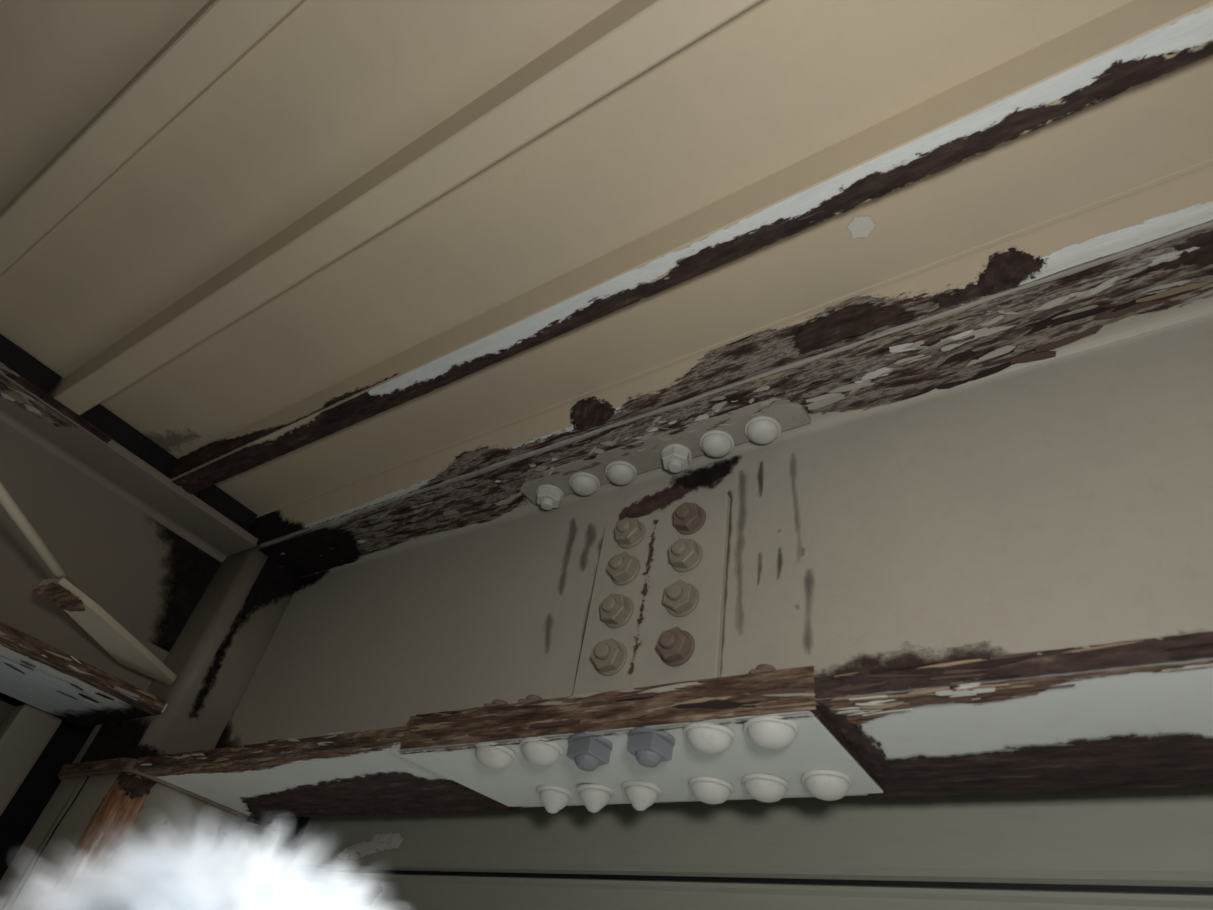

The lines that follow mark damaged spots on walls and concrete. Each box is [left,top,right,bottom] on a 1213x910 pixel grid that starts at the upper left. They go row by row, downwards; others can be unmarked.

peeling [360,6,1213,397]
peeling [284,201,1213,544]
peeling [0,644,126,716]
corrosion [168,738,300,762]
corrosion [189,557,329,718]
corrosion [411,707,478,742]
corrosion [38,757,157,909]